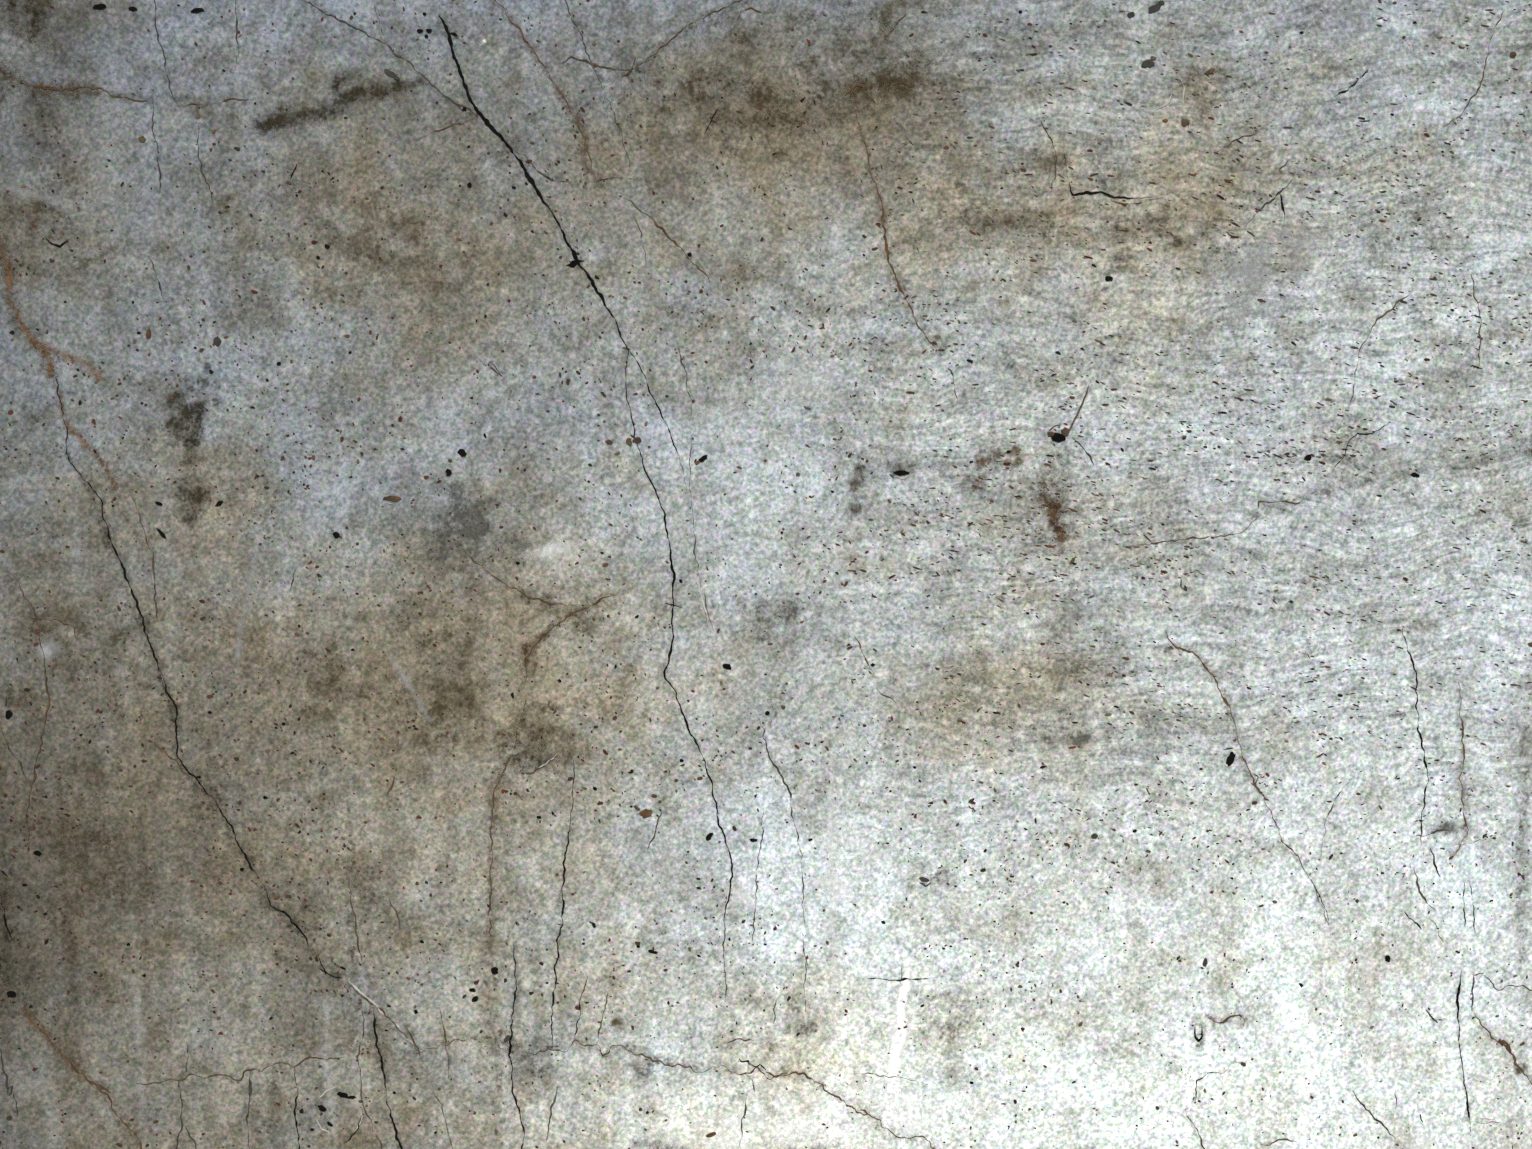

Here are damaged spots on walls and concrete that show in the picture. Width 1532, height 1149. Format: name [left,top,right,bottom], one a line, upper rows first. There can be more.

water stain [681,72,808,141]
crack [845,70,958,401]
crack [1041,121,1161,205]
crack [0,0,935,1149]
crack [1185,1062,1246,1149]
crack [1456,971,1532,1131]